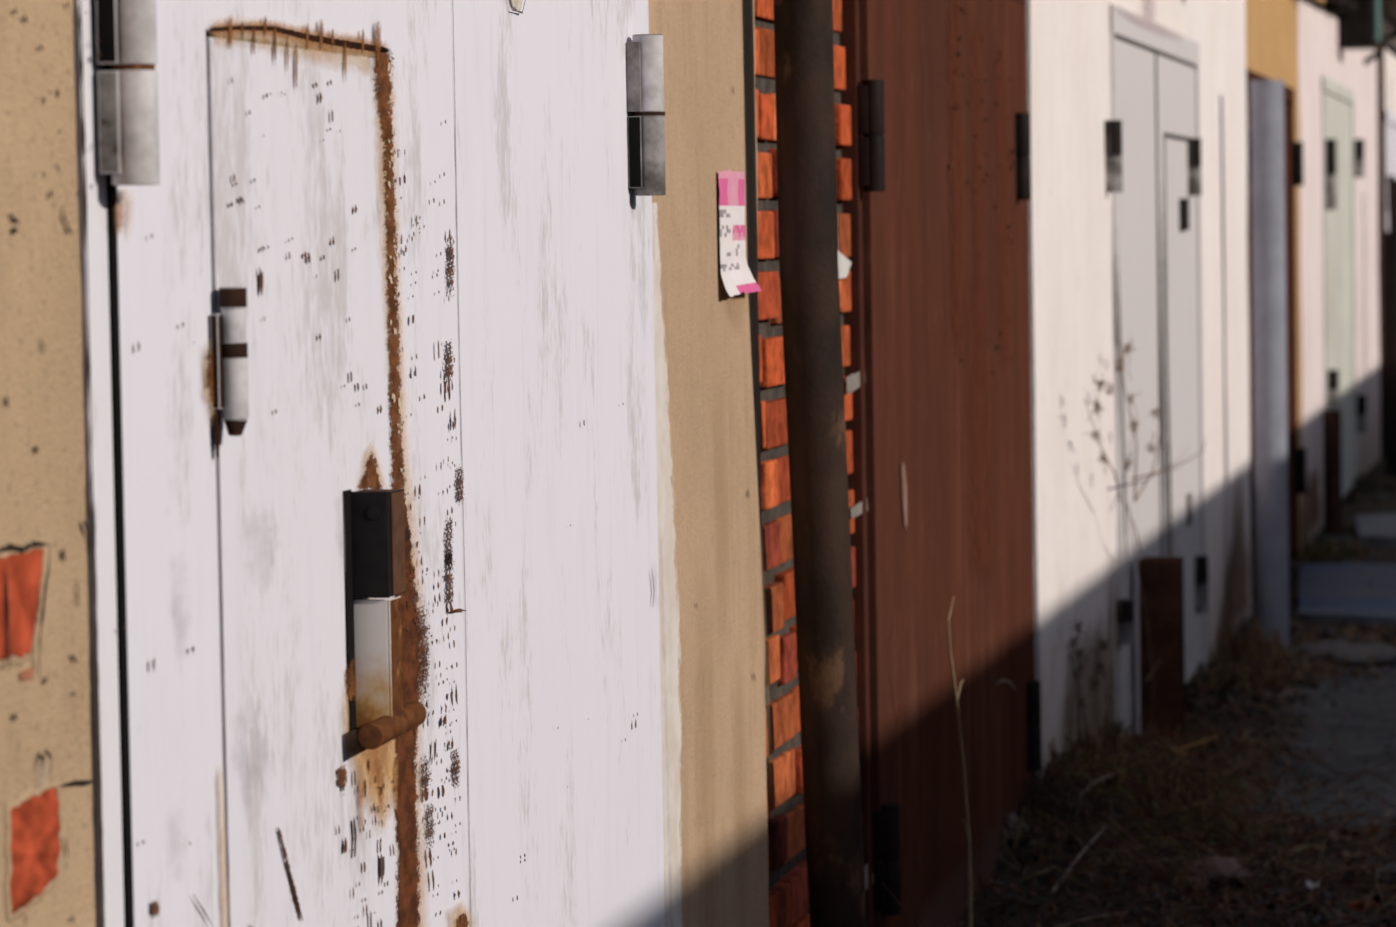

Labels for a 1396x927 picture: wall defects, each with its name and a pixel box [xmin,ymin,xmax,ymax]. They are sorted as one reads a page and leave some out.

rust [448,233,459,309]
rust [205,348,221,458]
rust [210,17,432,711]
rust [445,338,461,400]
flaking render [0,541,66,684]
rust [445,464,466,628]
flaking render [5,749,95,922]
rust [338,658,436,927]
rust [452,716,469,797]
rust [450,880,472,927]